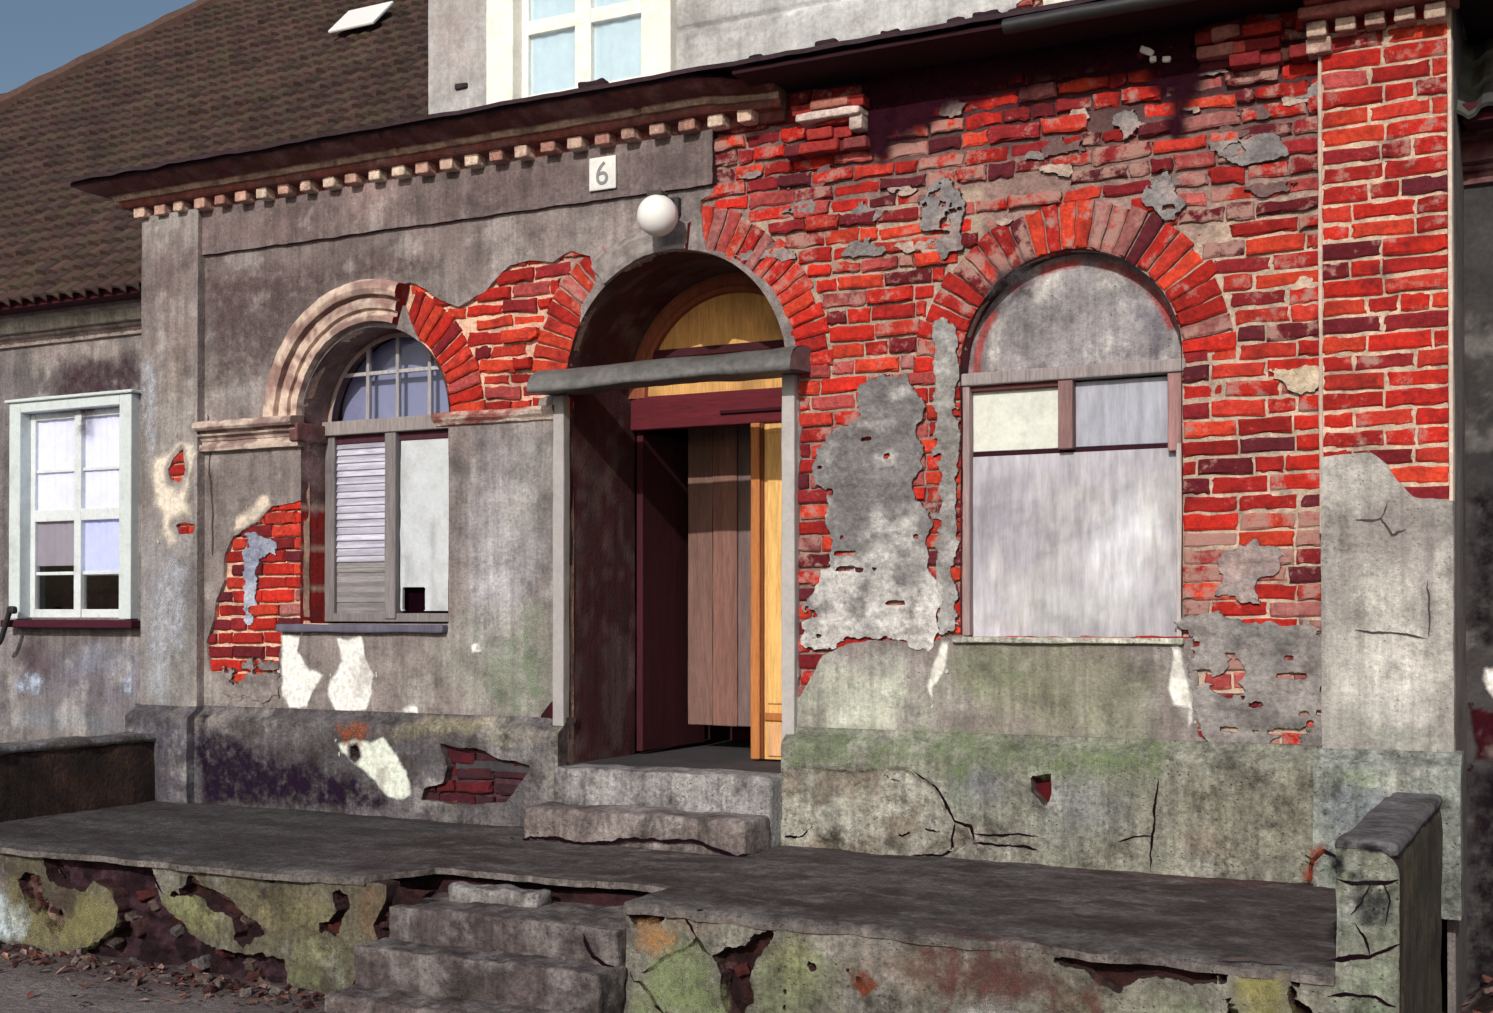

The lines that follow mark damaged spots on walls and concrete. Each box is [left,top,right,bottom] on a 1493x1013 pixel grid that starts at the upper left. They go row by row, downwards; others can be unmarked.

flaking render [403,246,606,412]
flaking render [697,10,1455,746]
peeling [153,433,205,545]
flaking render [206,495,378,711]
peeling [1485,669,1493,696]
flaking render [335,738,527,805]
crack [879,769,1038,857]
spalling [17,857,287,985]
spalling [712,930,774,1013]
spalling [1035,950,1239,1013]
spalling [1287,981,1313,1013]
crack [1305,849,1400,1007]